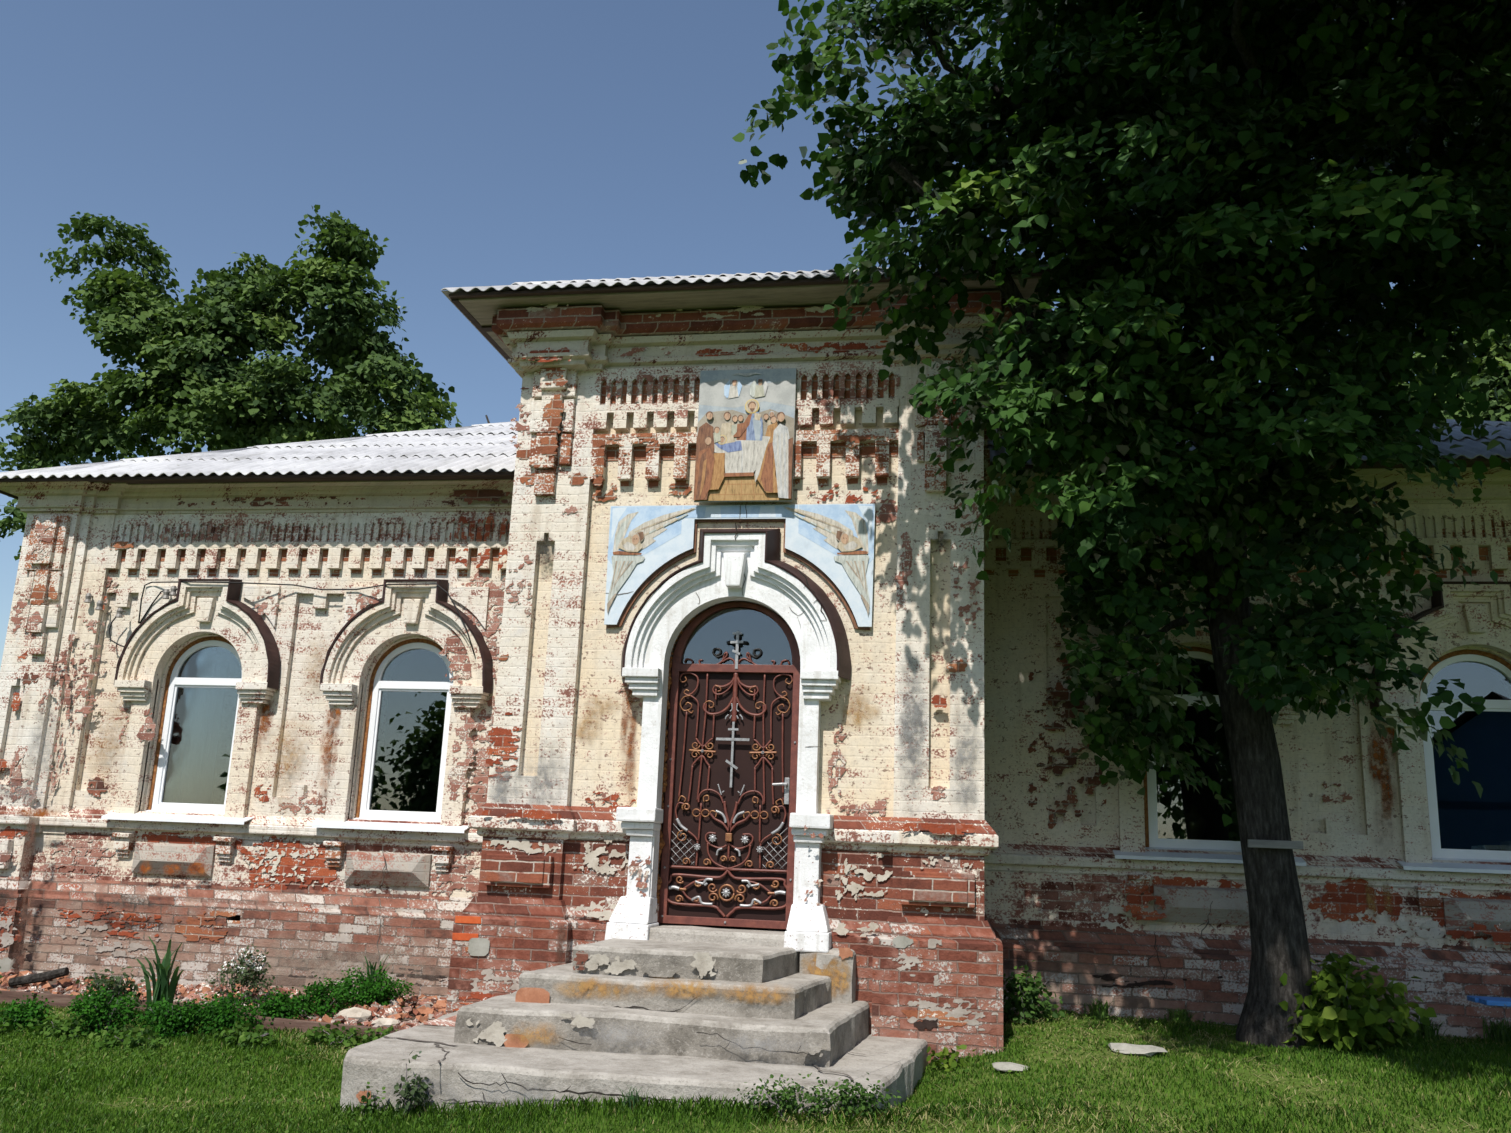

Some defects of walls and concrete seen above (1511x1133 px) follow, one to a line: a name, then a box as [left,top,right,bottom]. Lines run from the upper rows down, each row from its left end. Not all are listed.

peeling [568,433,692,502]
peeling [0,347,578,820]
leakage [903,677,922,784]
leakage [955,739,976,777]
peeling [133,831,481,952]
peeling [489,837,559,855]
peeling [573,836,651,897]
peeling [804,853,893,906]
peeling [1308,878,1511,951]
spalling [573,951,716,979]
spalling [423,991,529,1048]
crack [383,1036,736,1106]